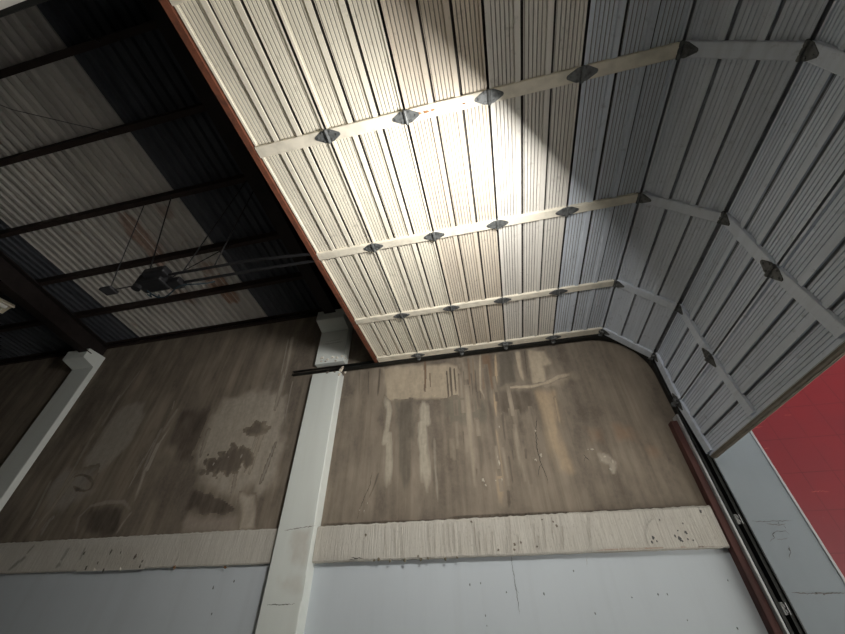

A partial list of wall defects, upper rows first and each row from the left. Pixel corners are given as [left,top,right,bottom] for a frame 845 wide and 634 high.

damp [3,336,295,572]
damp [272,348,670,601]